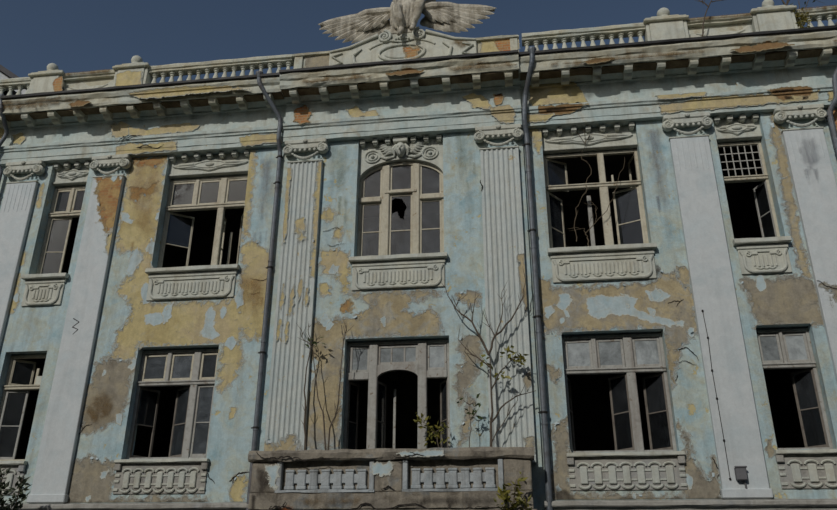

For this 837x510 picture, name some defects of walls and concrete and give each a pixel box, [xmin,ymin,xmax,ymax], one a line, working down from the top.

flaking render [293,105,312,125]
flaking render [346,106,379,118]
peeling [656,86,837,330]
peeling [80,119,486,451]
peeling [516,253,698,391]
crack [256,452,324,462]
crack [251,501,325,510]
crack [349,485,428,510]